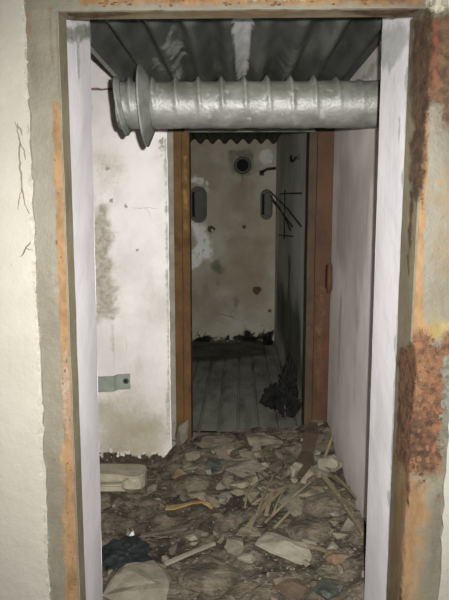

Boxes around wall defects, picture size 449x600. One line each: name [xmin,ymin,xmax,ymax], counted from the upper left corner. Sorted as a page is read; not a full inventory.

crack [14,121,29,213]
peeling [60,347,72,440]
water stain [93,142,130,352]
rust [387,1,449,600]